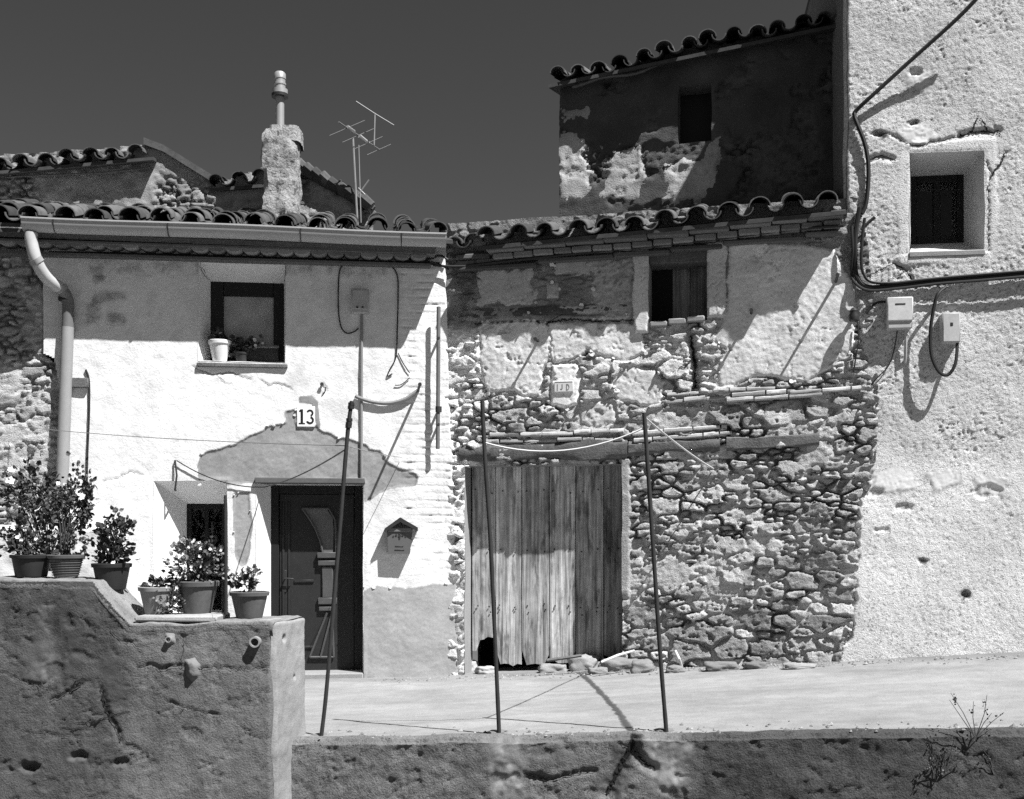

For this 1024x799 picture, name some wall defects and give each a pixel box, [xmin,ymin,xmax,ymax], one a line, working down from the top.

flaking render [559,106,650,202]
flaking render [662,136,722,206]
crack [870,118,1006,249]
peeling [475,255,665,428]